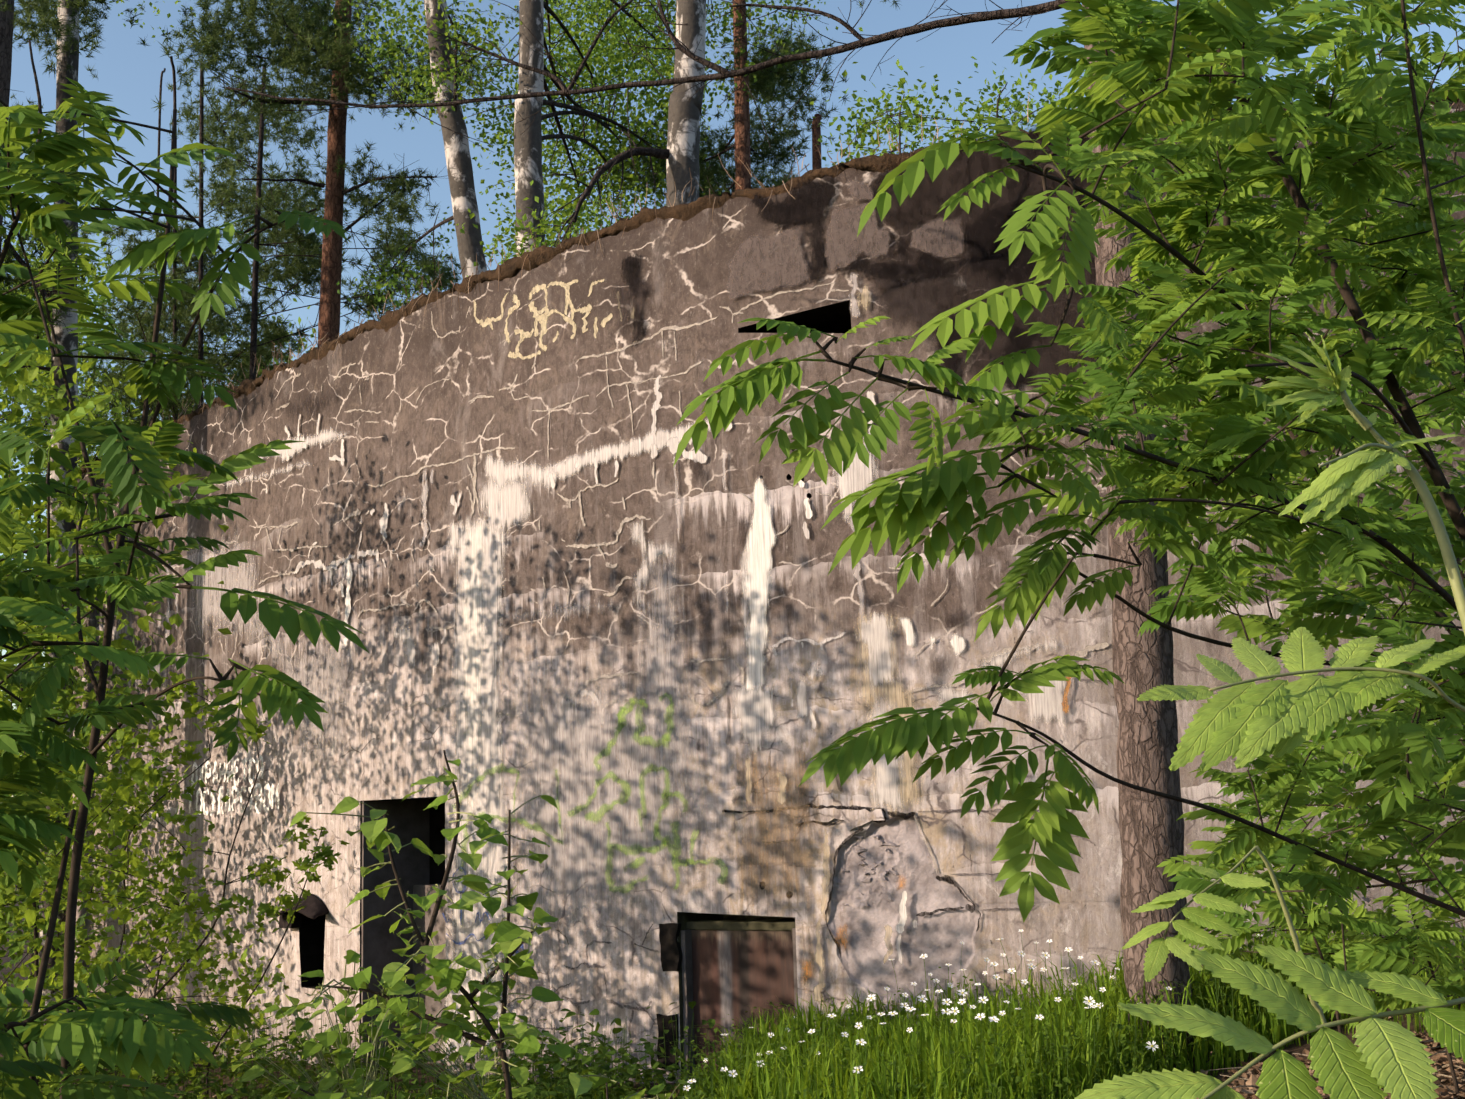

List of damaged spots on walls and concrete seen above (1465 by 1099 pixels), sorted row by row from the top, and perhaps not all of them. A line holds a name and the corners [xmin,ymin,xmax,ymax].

leakage [751,126,1101,403]
leakage [227,393,344,494]
leakage [360,503,400,540]
crack [218,279,849,633]
leakage [798,480,812,539]
leakage [393,420,732,1056]
crack [496,632,847,717]
leakage [725,478,775,770]
crack [859,559,1109,698]
crack [536,924,658,1035]
crack [722,803,1040,957]
spalling [826,816,983,1005]